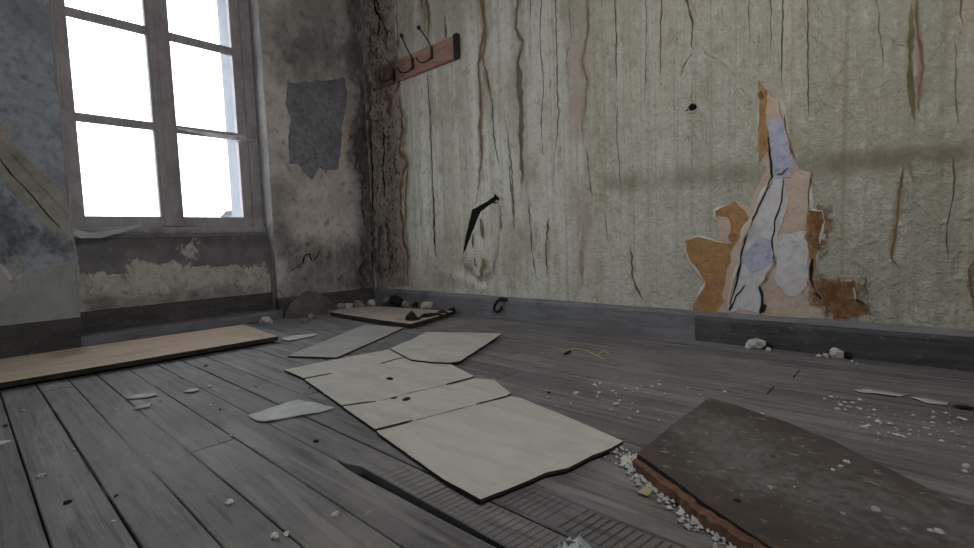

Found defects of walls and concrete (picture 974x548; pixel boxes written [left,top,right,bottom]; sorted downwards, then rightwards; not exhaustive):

peeling [0,141,270,326]
peeling [285,0,410,288]
damp [348,0,408,289]
damp [471,219,486,279]
damp [477,0,544,229]
damp [528,207,549,272]
damp [554,0,572,158]
damp [581,0,589,131]
peeling [683,80,870,320]